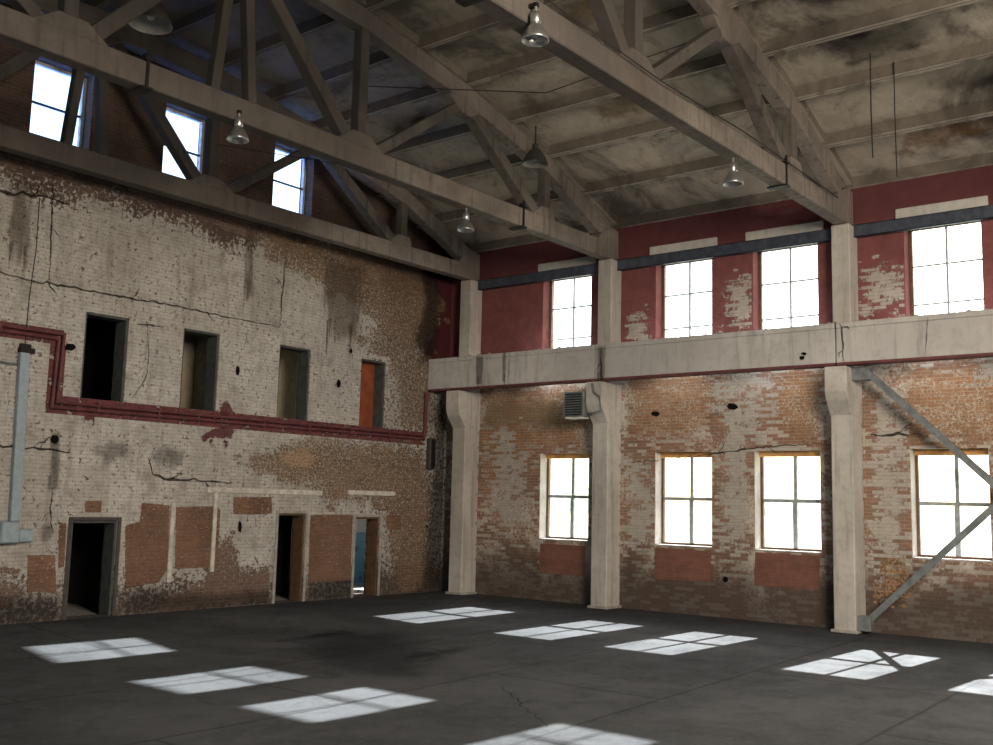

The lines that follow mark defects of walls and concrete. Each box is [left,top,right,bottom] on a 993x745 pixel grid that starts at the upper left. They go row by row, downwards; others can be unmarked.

crack [0,181,286,398]
peeling [718,269,752,333]
peeling [858,254,905,317]
peeling [123,185,450,593]
crack [0,437,71,453]
crack [149,460,231,487]
flaking render [0,523,66,609]
peeling [122,497,272,612]